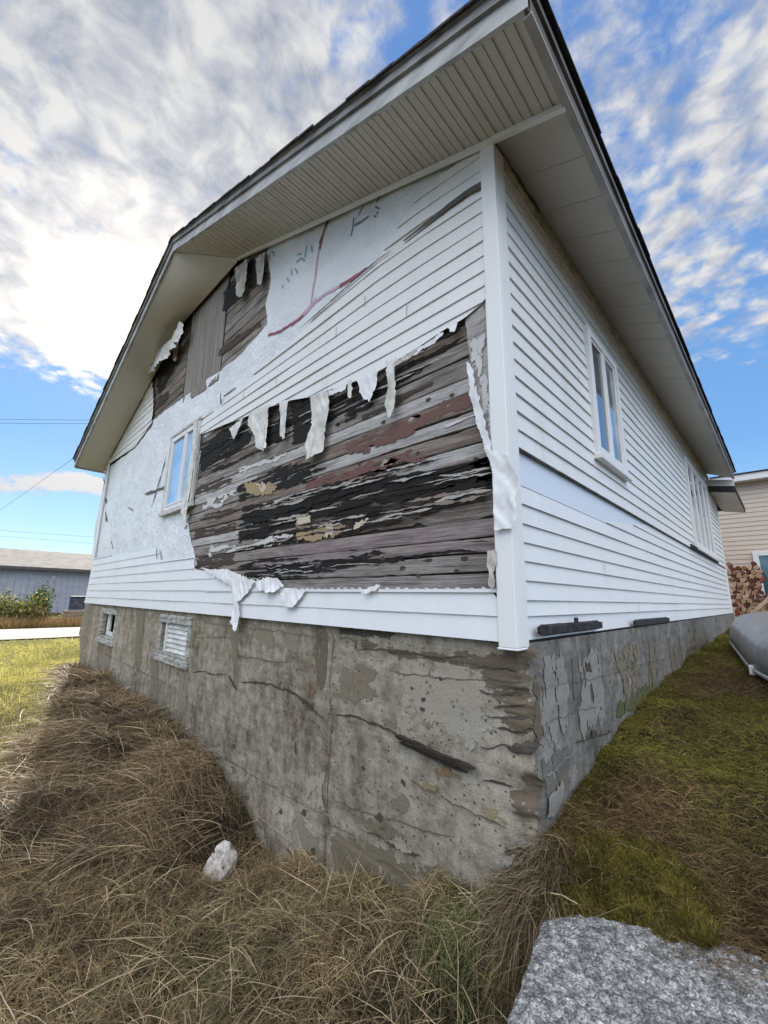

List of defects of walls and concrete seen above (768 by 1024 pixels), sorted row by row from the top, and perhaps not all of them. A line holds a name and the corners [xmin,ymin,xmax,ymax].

peeling [469,333,491,435]
crack [192,623,479,876]
spalling [507,740,542,755]
spalling [521,772,546,789]